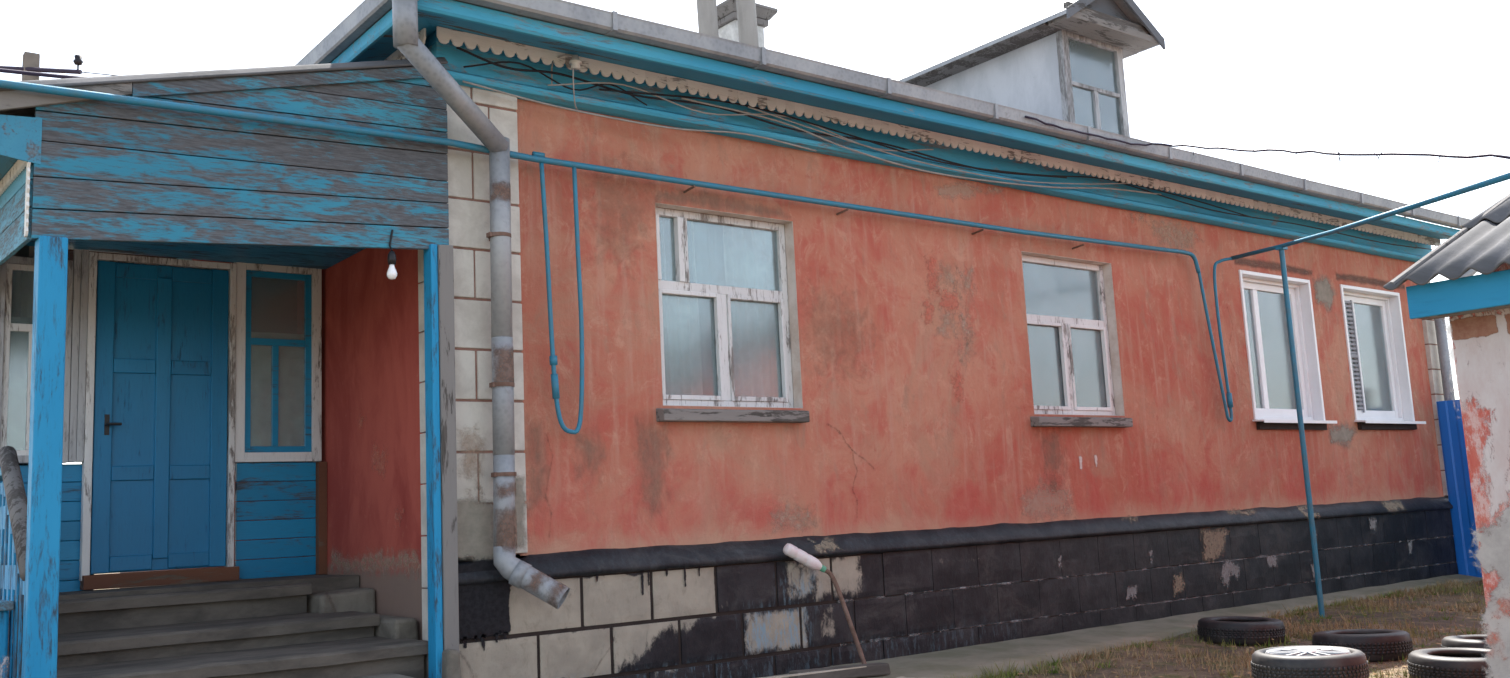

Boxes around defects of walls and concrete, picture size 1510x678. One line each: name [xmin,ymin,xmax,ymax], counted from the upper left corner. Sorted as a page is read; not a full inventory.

rust [494,348,514,382]
rust [497,483,517,549]
peeling [1443,308,1510,678]
peeling [1200,527,1240,587]